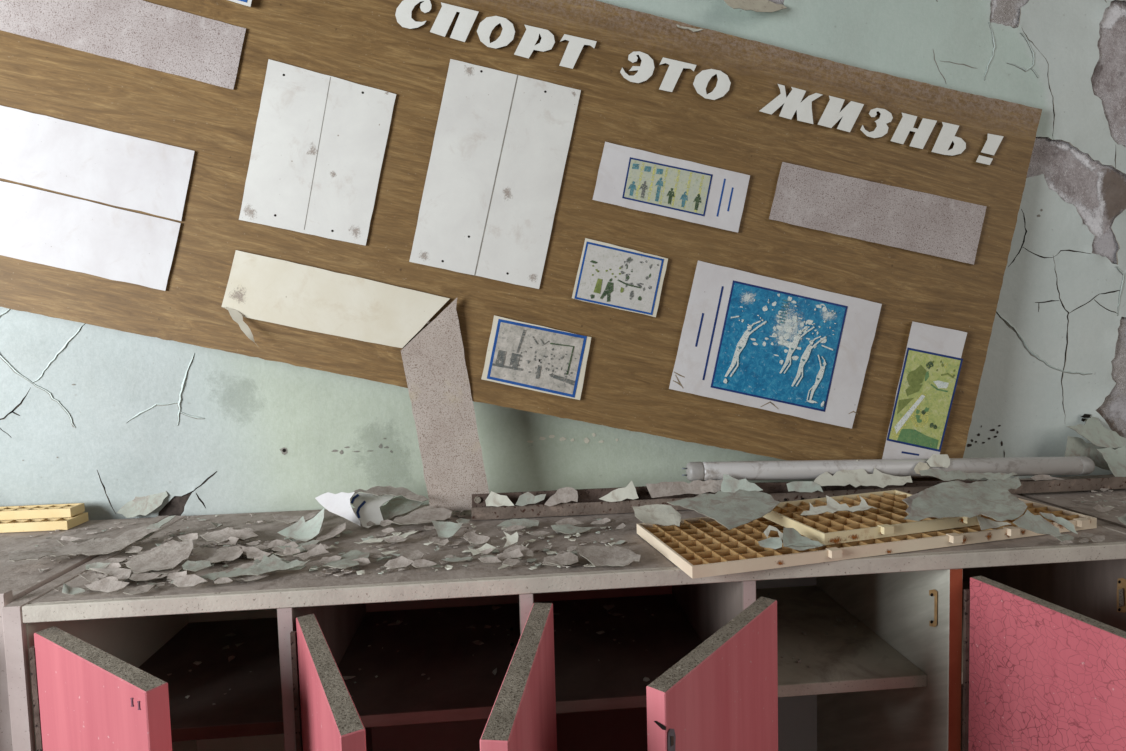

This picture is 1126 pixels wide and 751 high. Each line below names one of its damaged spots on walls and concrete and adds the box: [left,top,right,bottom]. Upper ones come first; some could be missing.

peeling [990,0,1029,28]
peeling [1091,0,1126,147]
peeling [1026,137,1126,264]
crack [1012,214,1126,414]
crack [0,323,85,438]
crack [126,354,204,426]
peeling [1065,317,1126,477]
crack [193,471,217,508]